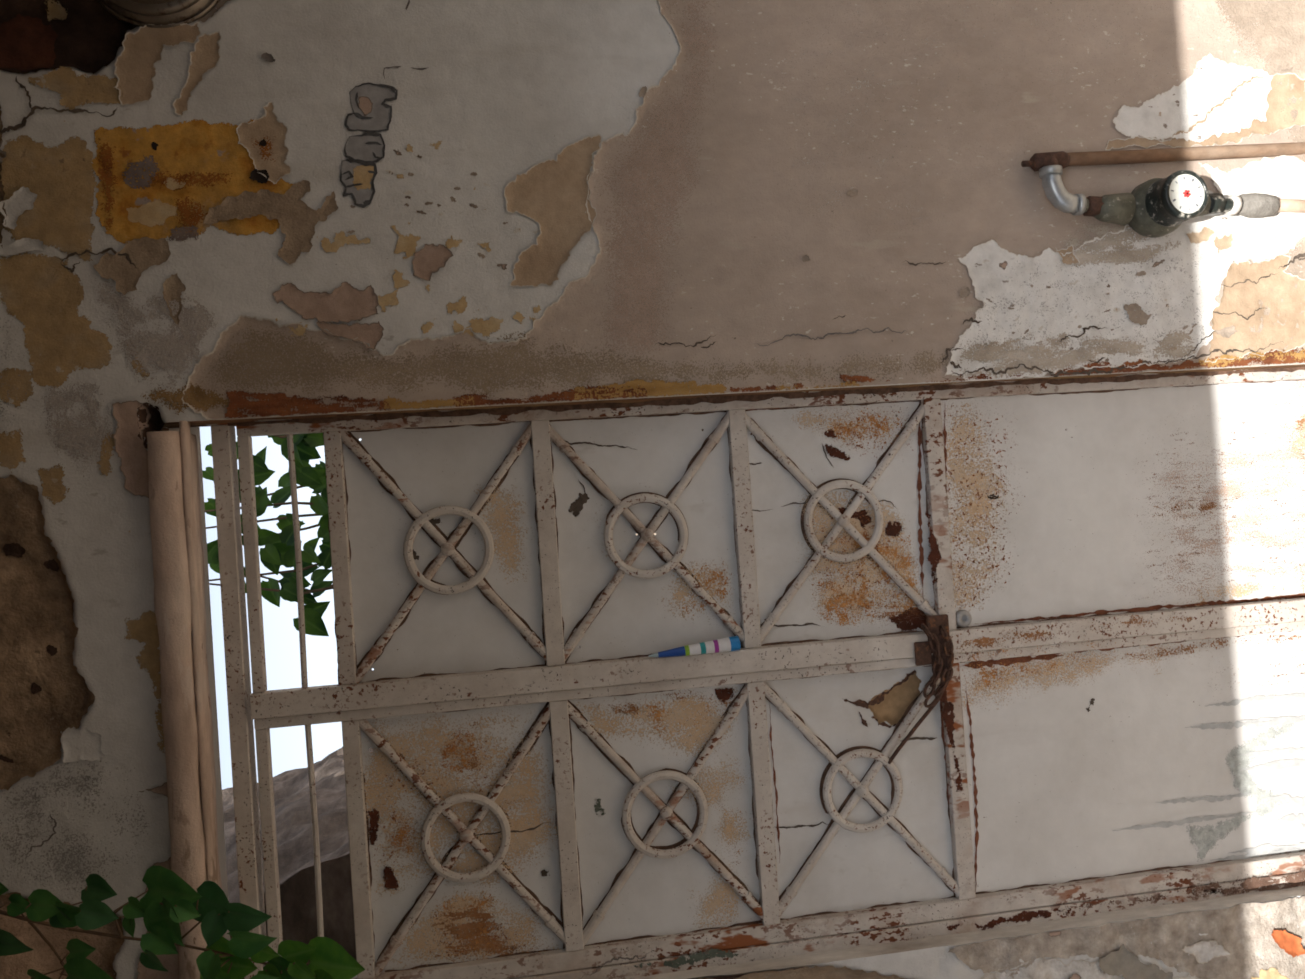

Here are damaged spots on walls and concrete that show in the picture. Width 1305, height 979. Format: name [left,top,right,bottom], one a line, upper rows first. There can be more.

peeling [181,0,1305,420]
flaking render [93,237,186,324]
corrosion [142,374,890,419]
corrosion [1051,347,1305,376]
flaking render [0,475,95,790]
corrosion [748,380,1305,894]
corrosion [363,707,559,971]
flaking render [0,892,125,979]
flaking render [137,945,180,979]
flaking render [634,948,905,979]
peeling [1099,944,1173,979]
flaking render [1271,930,1305,958]